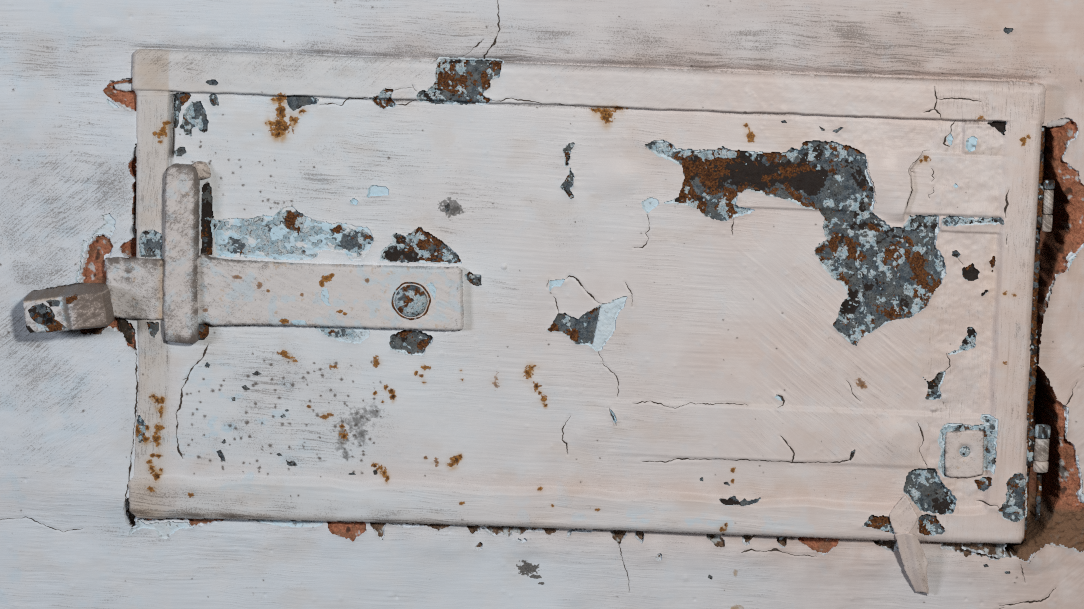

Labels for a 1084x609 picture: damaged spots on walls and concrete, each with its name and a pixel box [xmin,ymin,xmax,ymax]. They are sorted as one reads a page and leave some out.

crack [462,1,500,59]
peeling [416,57,504,106]
peeling [173,79,219,157]
rust [265,92,306,138]
peeling [201,183,482,286]
peeling [641,126,1005,346]
peeling [547,296,628,351]
spalling [903,117,1084,562]
rust [135,394,165,492]
rust [307,405,348,441]
rust [424,454,462,467]
crack [999,567,1056,609]